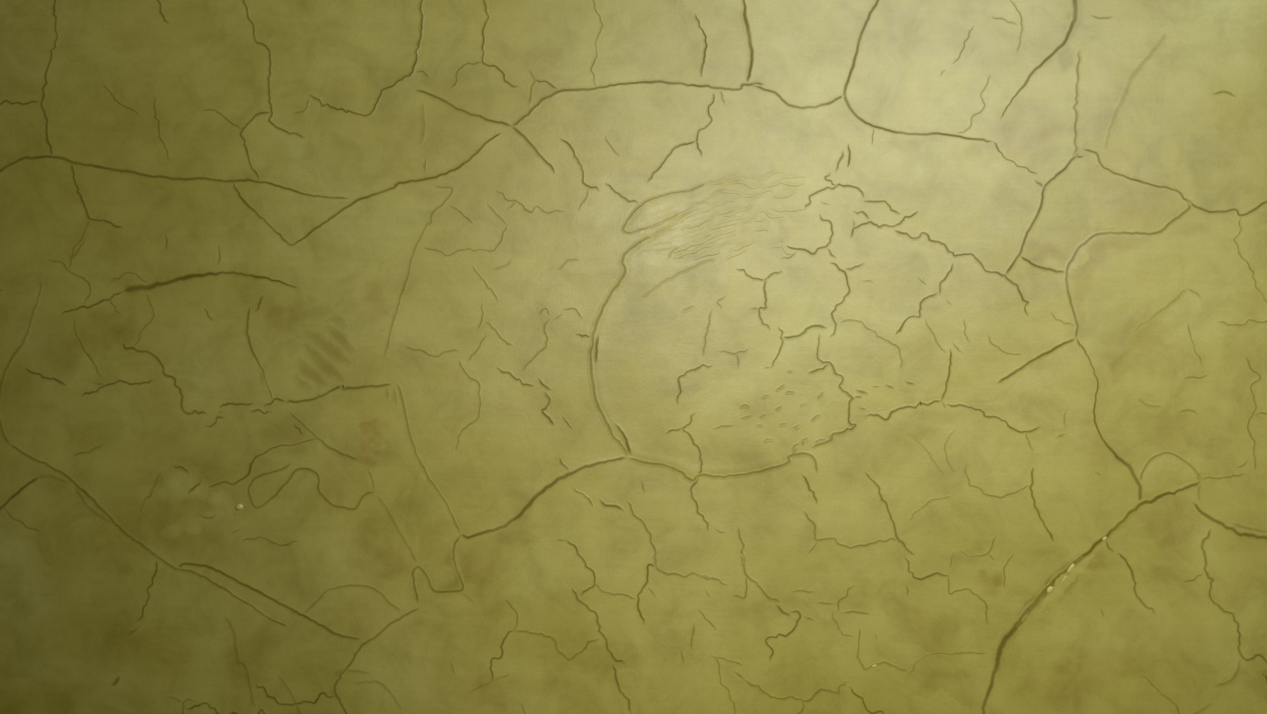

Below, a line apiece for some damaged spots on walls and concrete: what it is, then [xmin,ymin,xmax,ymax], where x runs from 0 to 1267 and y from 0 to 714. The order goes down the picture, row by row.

crack [0,0,1267,547]
crack [128,560,159,636]
crack [168,615,335,714]
crack [460,295,1267,714]